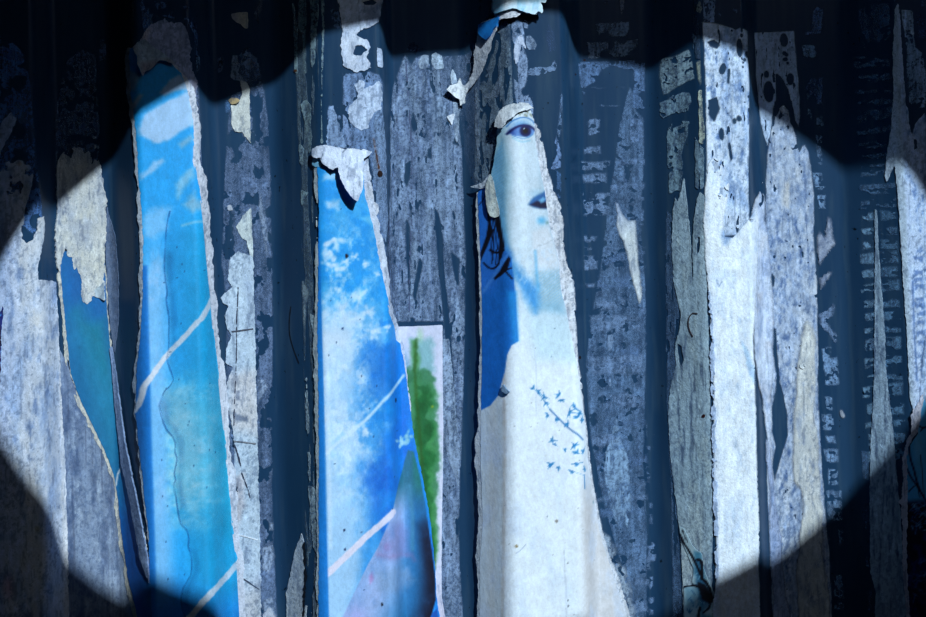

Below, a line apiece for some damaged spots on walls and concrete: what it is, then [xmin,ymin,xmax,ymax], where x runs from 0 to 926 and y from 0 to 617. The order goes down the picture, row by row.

peeling [326,80,388,242]